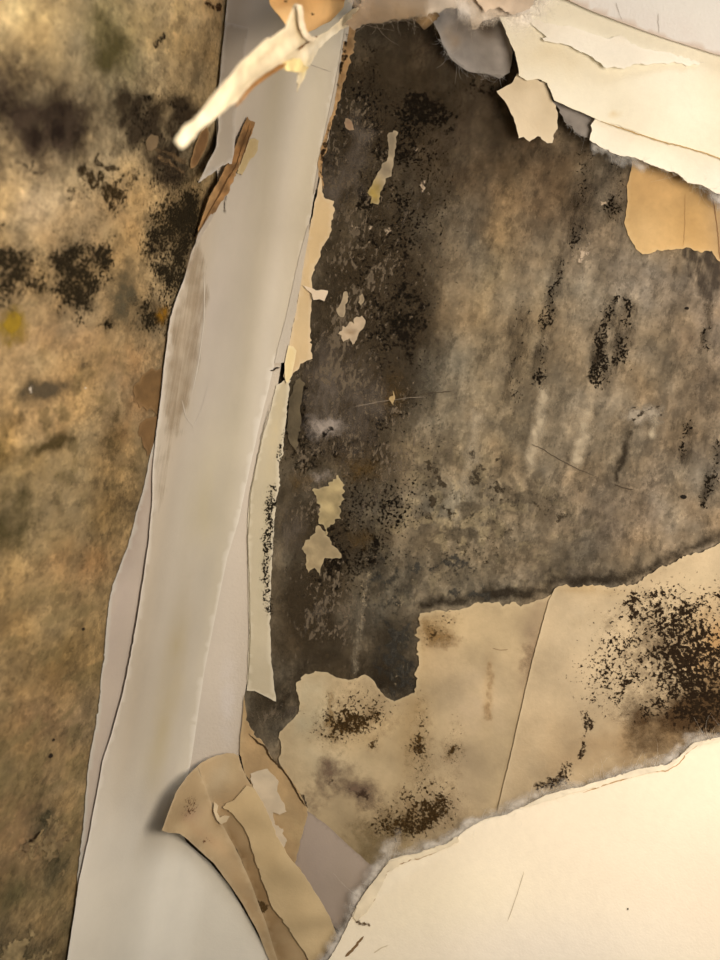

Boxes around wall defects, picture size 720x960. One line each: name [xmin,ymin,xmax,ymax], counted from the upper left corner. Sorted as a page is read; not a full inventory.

peeling [146,134,158,151]
water stain [0,51,207,337]
water stain [683,249,720,310]
water stain [259,19,498,749]
water stain [510,223,587,465]
water stain [588,295,635,390]
water stain [615,406,660,480]
water stain [698,441,719,509]
water stain [479,587,533,601]
water stain [534,552,720,793]
water stain [321,760,374,800]
water stain [368,690,462,843]